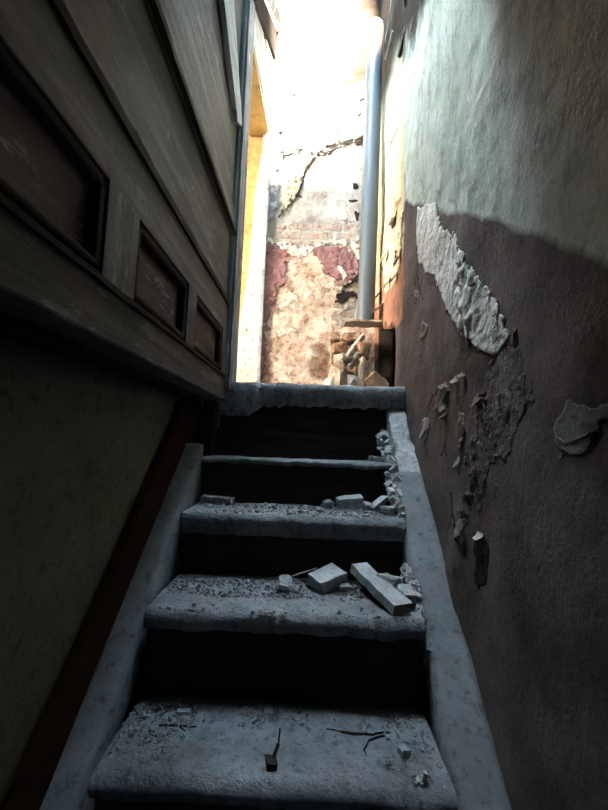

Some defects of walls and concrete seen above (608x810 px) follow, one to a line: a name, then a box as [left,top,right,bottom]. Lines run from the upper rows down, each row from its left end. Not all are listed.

peeling [240,77,365,382]
peeling [409,202,518,366]
peeling [419,417,430,441]
peeling [452,391,487,468]
flaking render [453,518,490,590]